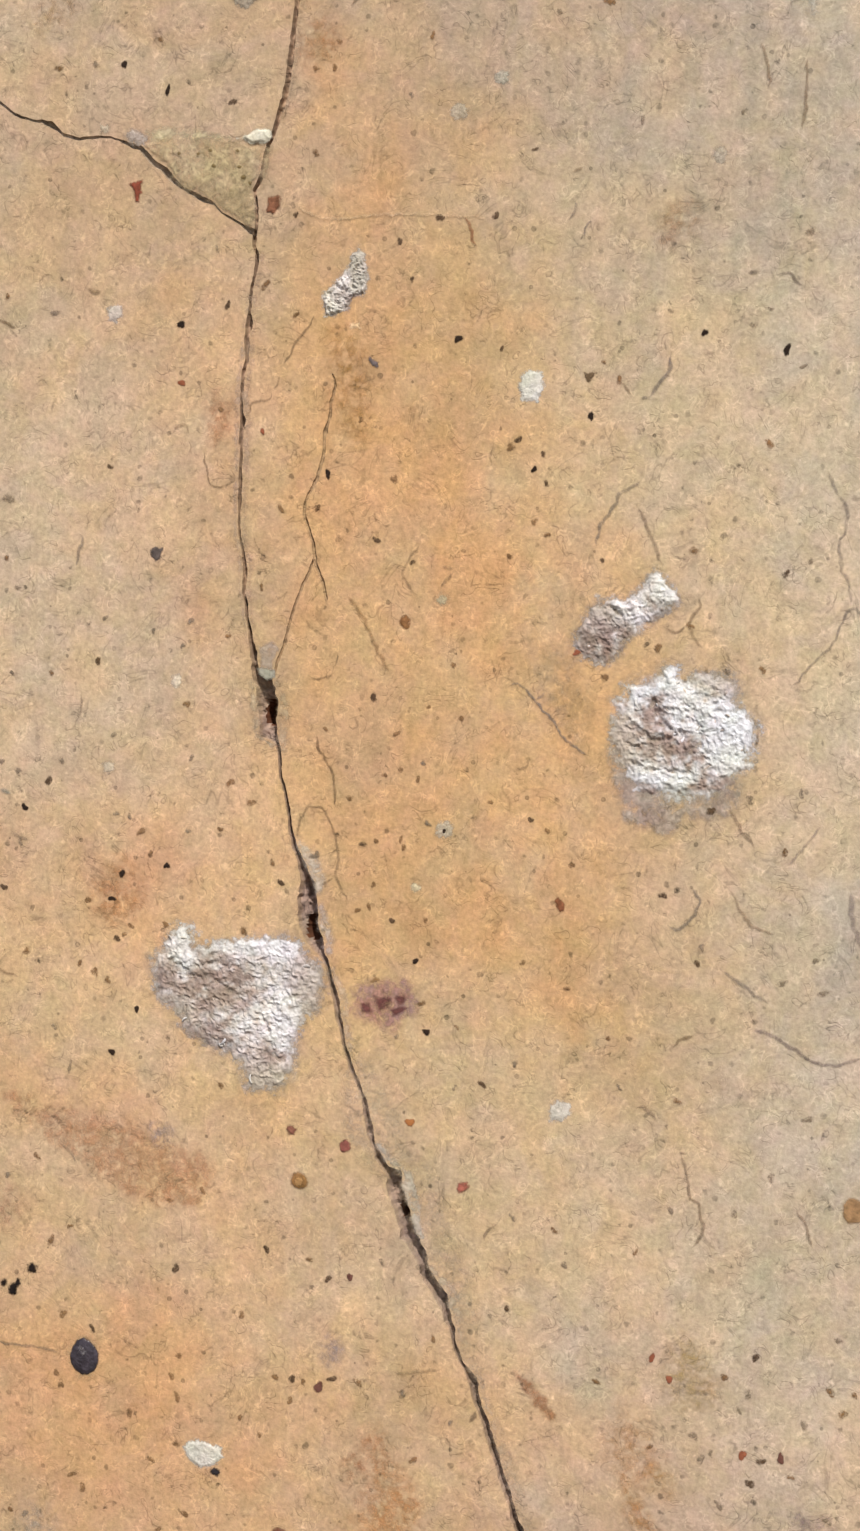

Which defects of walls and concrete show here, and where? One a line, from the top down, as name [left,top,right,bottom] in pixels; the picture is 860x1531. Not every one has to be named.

crack [0,0,530,1531]
crack [514,683,584,754]